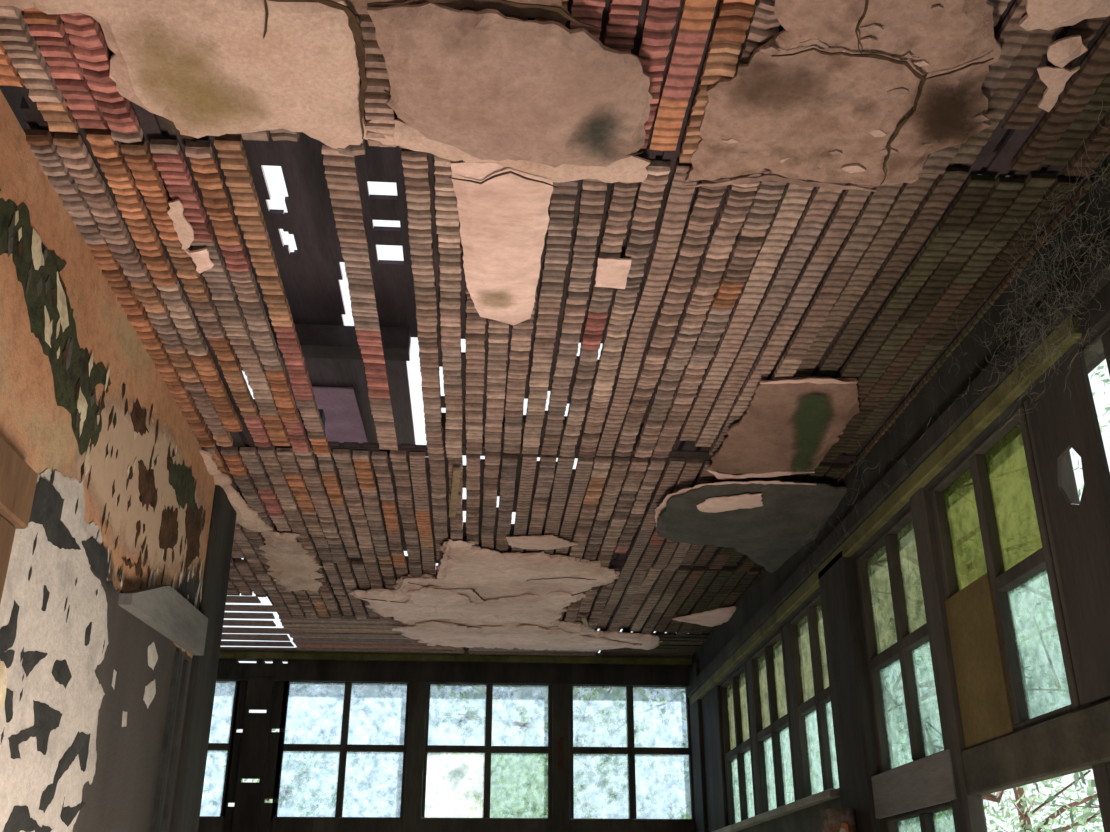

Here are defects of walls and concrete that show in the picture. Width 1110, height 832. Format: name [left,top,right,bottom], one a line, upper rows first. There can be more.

spalling [359,14,391,95]
crack [263,0,602,139]
crack [771,0,994,185]
peeling [1037,35,1088,112]
water stain [578,120,615,157]
water stain [792,395,832,474]
peeling [0,188,206,832]
spalling [654,470,816,527]
spalling [397,544,449,593]